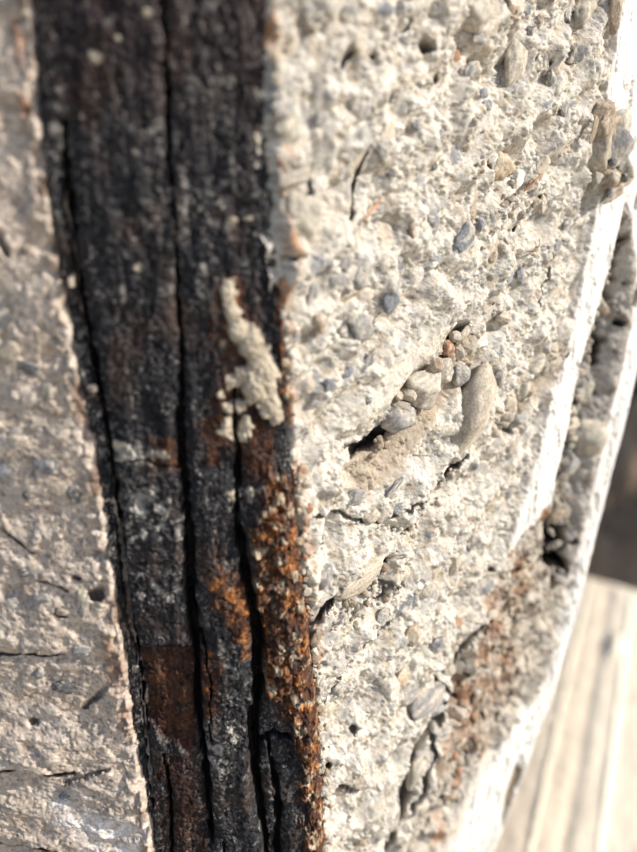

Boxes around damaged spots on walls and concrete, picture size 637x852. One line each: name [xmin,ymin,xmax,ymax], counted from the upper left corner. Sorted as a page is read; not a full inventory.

spalling [0,0,164,852]
rust [98,634,134,737]
rust [148,435,189,475]
rust [140,636,224,852]
rust [198,272,324,852]
spalling [253,0,623,852]
rust [429,809,449,852]
rust [450,765,463,794]
rust [449,555,531,761]
rust [534,504,553,532]